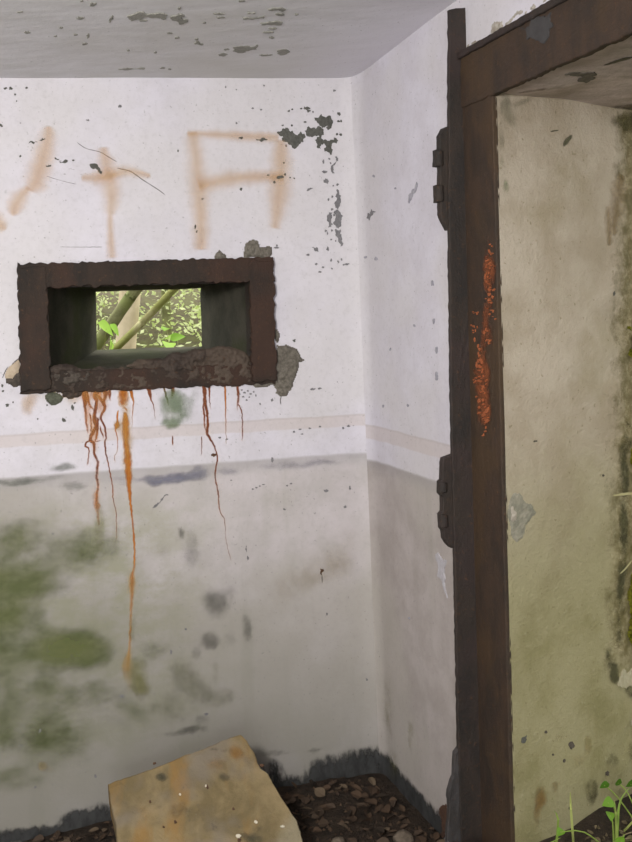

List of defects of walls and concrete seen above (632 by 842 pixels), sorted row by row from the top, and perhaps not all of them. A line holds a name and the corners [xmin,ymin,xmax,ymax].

peeling [127,7,188,25]
peeling [218,45,290,57]
peeling [242,7,286,39]
peeling [277,107,349,273]
spalling [1,359,21,392]
spalling [239,329,304,405]
corrosion [470,244,497,436]
corrosion [201,386,226,530]
corrosion [82,390,135,606]
spalling [508,493,536,542]
leakage [0,805,112,842]
leakage [269,748,444,839]